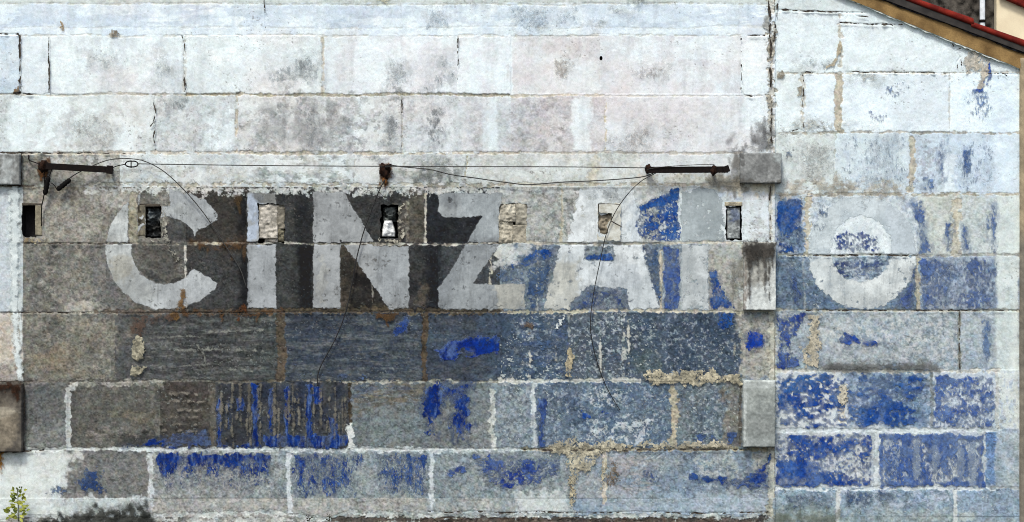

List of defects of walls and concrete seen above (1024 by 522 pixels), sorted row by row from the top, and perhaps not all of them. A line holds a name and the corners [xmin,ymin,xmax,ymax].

leakage [741,239,777,301]
corrosion [130,289,283,337]
peeling [434,335,500,361]
peeling [688,270,995,510]
peeling [141,364,367,498]